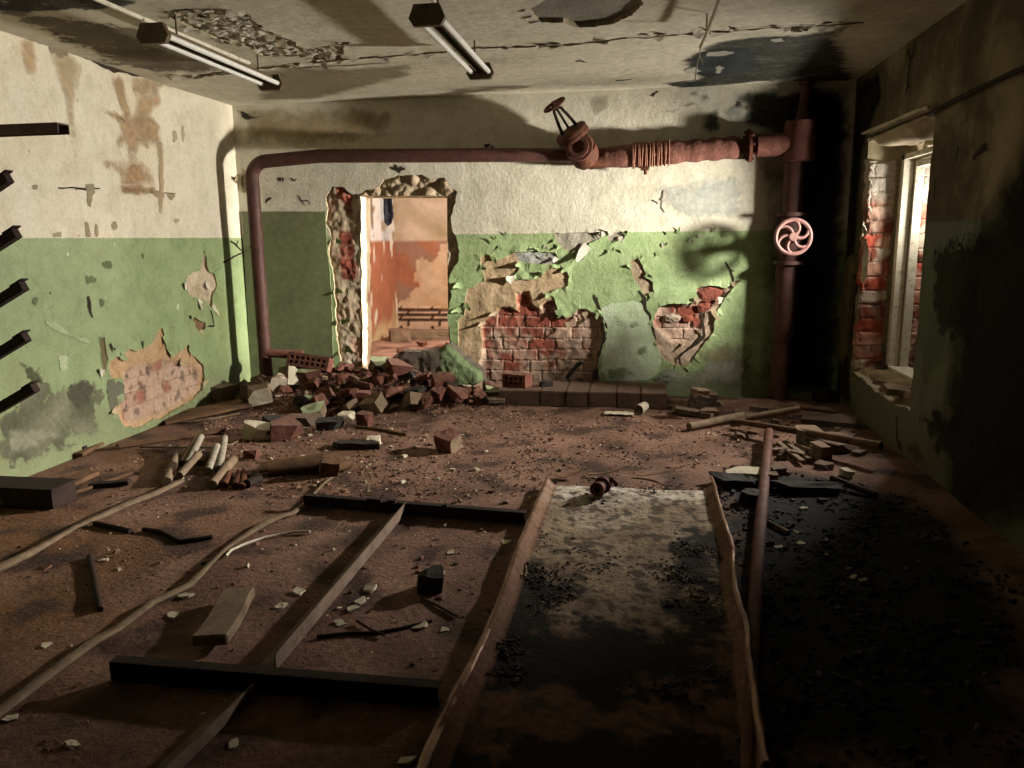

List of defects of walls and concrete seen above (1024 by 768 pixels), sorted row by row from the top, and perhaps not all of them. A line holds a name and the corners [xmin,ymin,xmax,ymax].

flaking render [166,8,347,62]
leakage [110,78,164,212]
peeling [185,249,221,335]
flaking render [326,175,740,388]
peeling [862,206,872,282]
leakage [0,363,104,468]
flaking render [100,329,209,428]